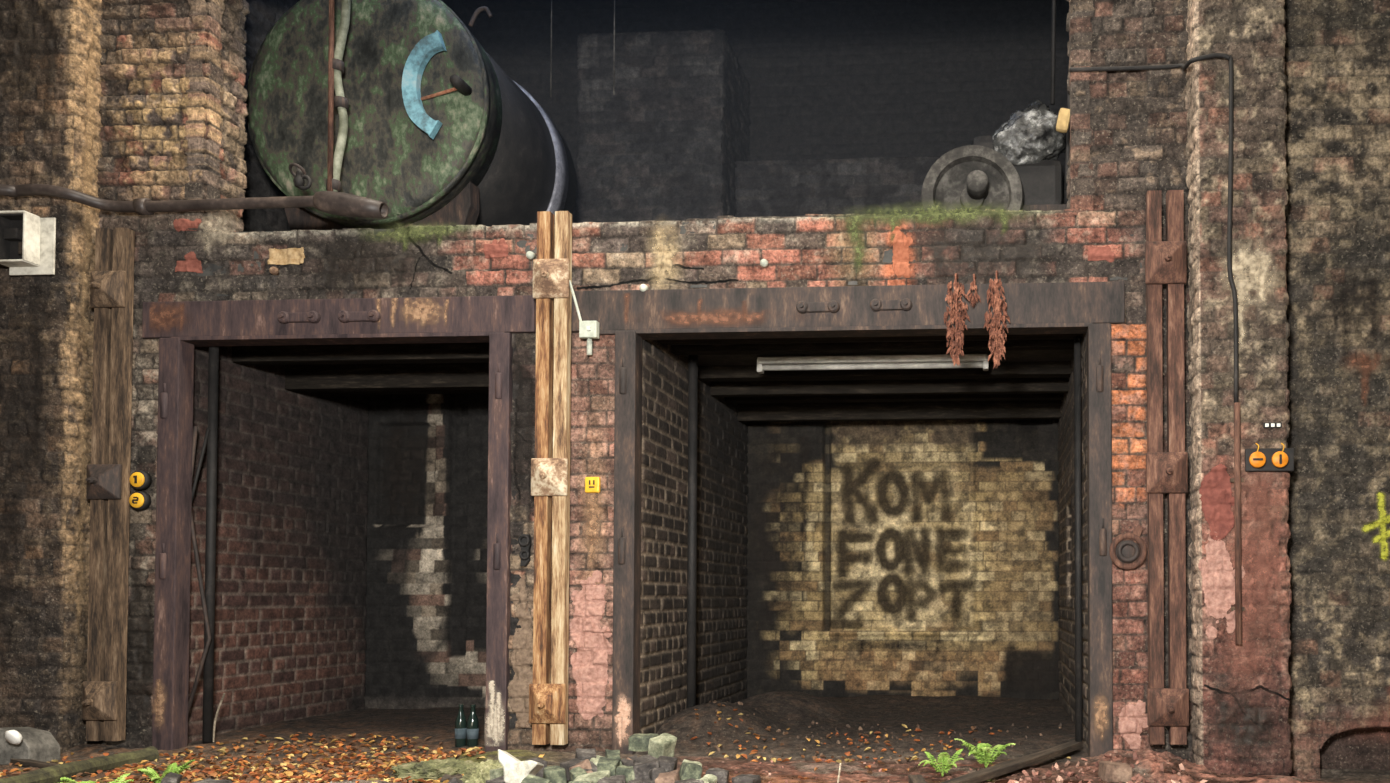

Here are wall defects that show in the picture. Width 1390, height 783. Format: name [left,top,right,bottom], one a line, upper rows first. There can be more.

corrosion [377,298,449,324]
corrosion [666,299,762,324]
flaking render [1198,464,1245,640]